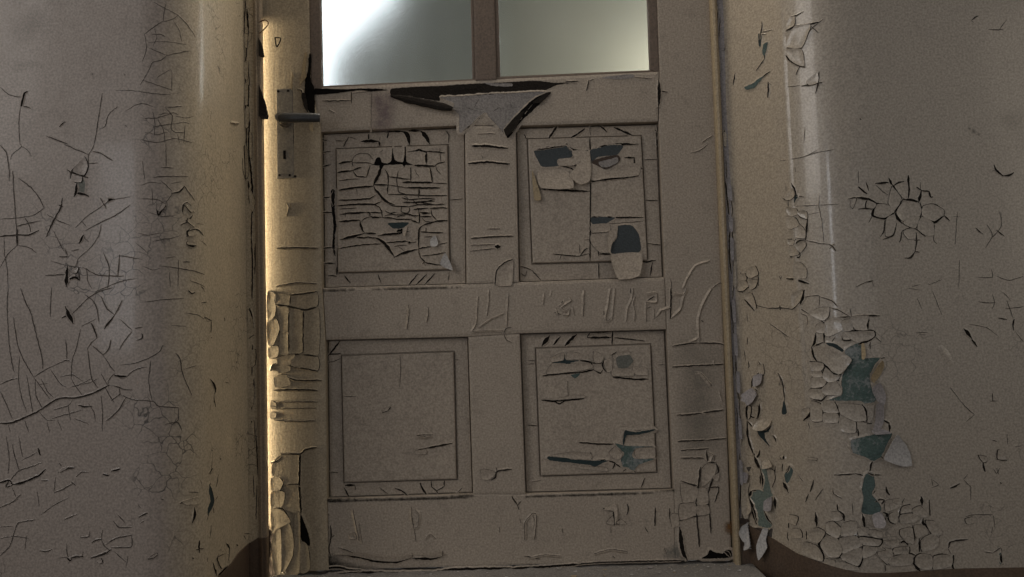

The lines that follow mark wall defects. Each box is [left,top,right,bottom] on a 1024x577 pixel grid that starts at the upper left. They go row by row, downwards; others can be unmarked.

peeling [743,11,823,98]
peeling [439,89,553,141]
peeling [531,137,644,280]
crack [0,2,212,566]
peeling [266,290,320,374]
peeling [543,350,648,381]
peeling [737,167,956,571]
peeling [544,426,658,473]
peeling [270,446,317,575]